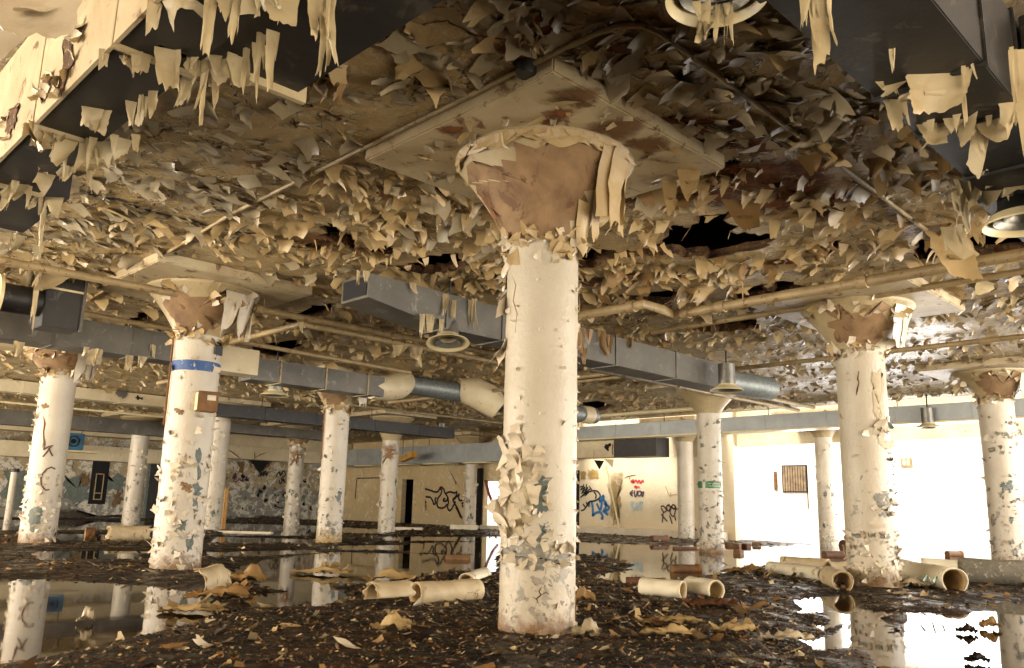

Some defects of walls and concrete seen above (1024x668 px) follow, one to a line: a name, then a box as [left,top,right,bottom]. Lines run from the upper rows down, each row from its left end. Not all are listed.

damp [552,87,600,106]
damp [588,119,667,153]
peeling [0,0,1024,467]
peeling [0,462,90,542]
peeling [73,400,267,570]
peeling [212,355,581,571]
peeling [696,464,727,549]
peeling [819,473,905,587]
peeling [981,473,1024,560]